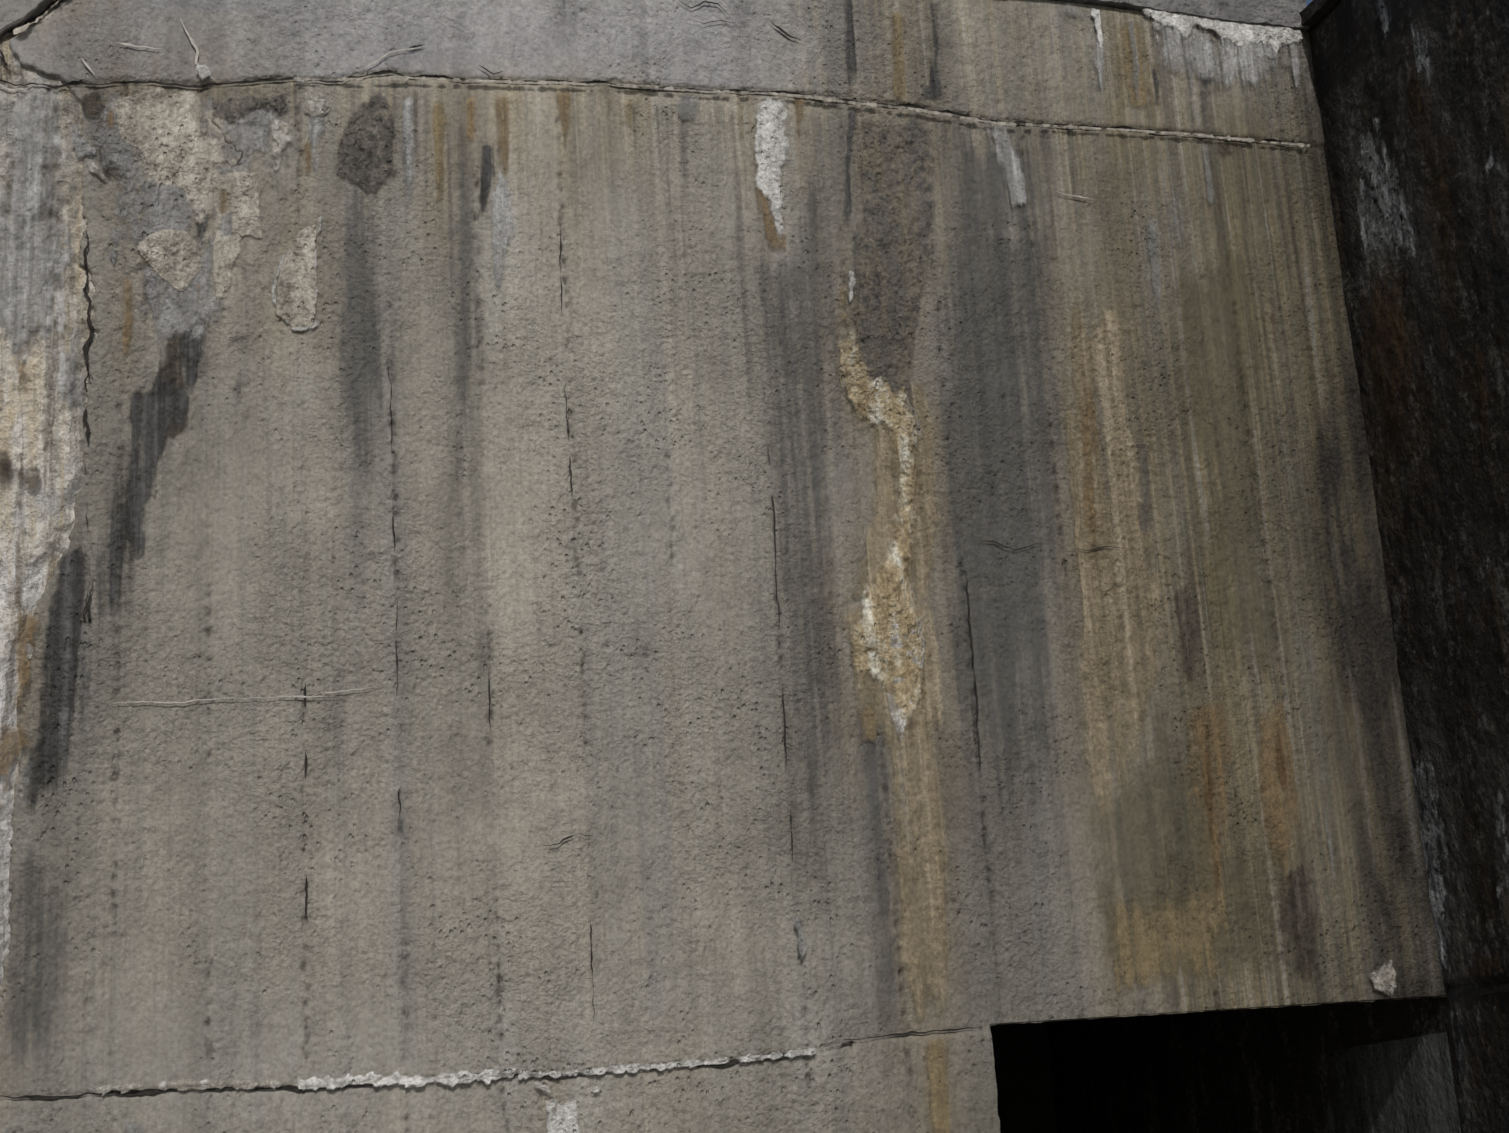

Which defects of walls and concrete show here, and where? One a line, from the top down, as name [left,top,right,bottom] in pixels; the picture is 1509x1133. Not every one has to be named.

crack [0,0,1310,147]
leakage [988,126,1026,205]
leakage [1357,118,1416,257]
peeling [272,216,322,331]
crack [564,383,573,494]
leakage [23,312,203,805]
spalling [0,0,274,1020]
crack [772,497,780,644]
crack [302,876,310,914]
leakage [1371,960,1396,995]
crack [2,1027,983,1100]
leakage [1355,1013,1470,1133]